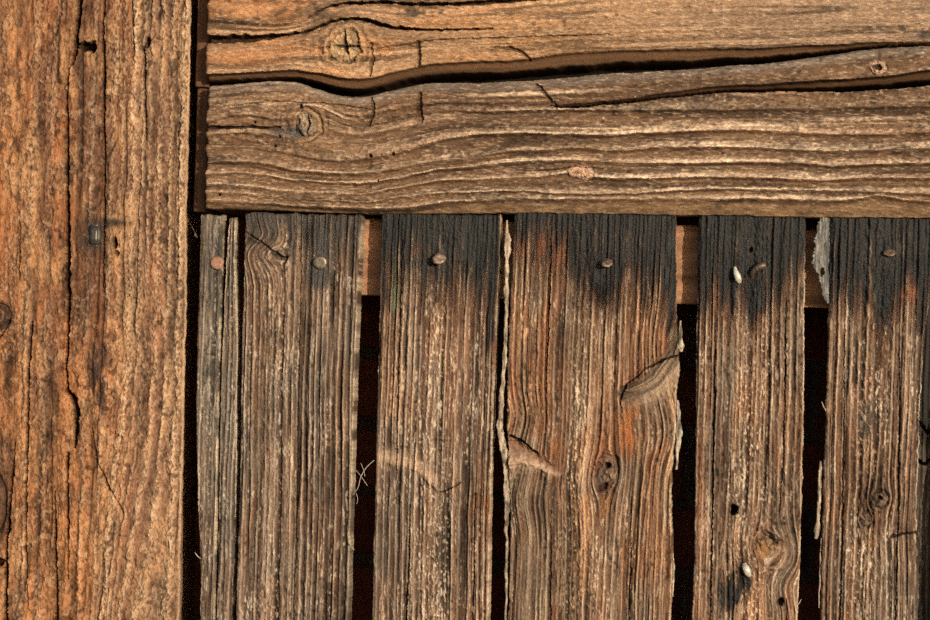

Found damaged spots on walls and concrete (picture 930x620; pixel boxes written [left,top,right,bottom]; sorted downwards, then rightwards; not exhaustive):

crack [131,0,148,140]
crack [53,0,125,620]
crack [0,318,34,620]
crack [508,434,539,455]
crack [619,354,678,413]